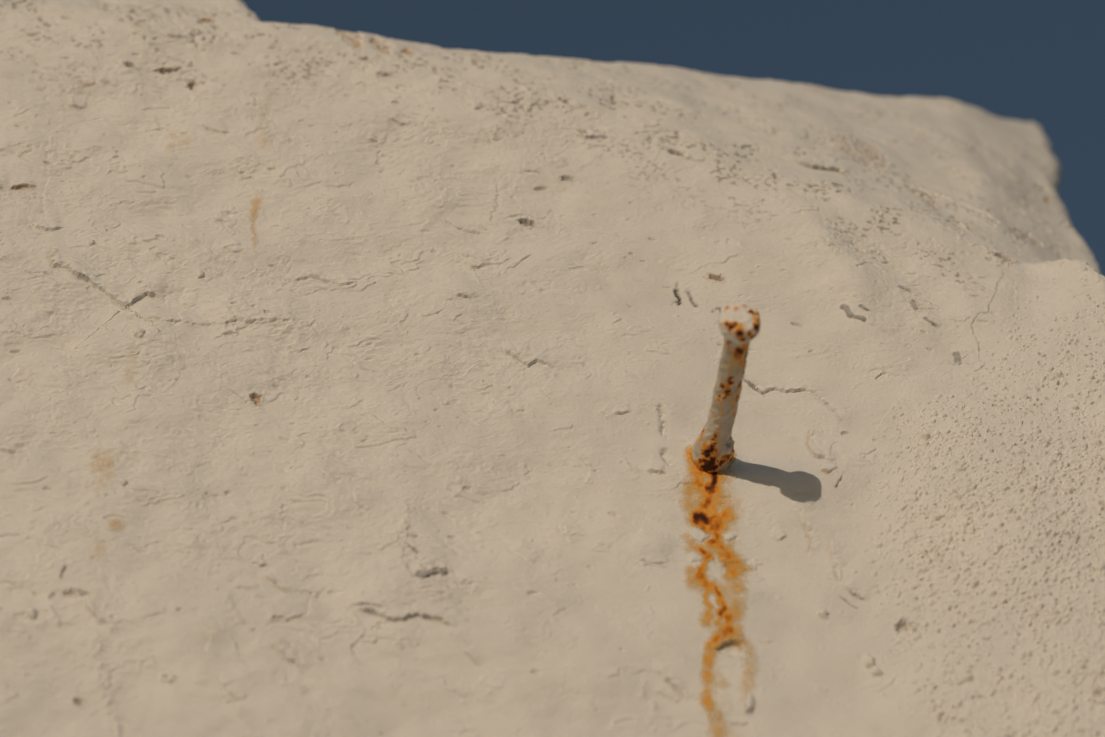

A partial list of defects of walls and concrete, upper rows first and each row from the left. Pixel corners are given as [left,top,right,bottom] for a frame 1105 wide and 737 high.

crack [670,281,722,322]
crack [742,363,852,427]
corrosion [684,446,752,737]